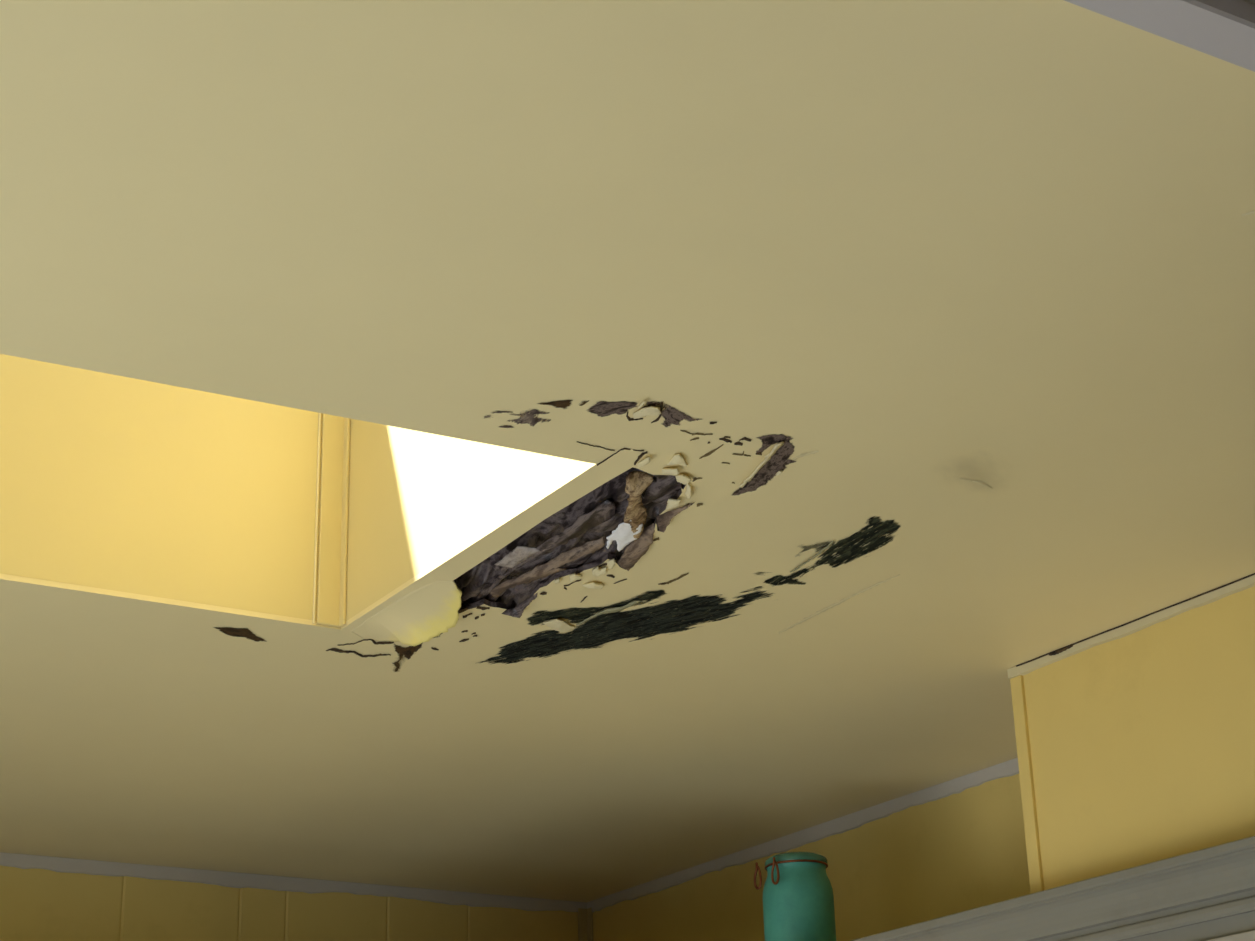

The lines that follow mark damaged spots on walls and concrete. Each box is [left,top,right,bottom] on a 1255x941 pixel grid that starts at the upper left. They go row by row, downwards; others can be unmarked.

spalling [539,400,701,427]
spalling [732,434,796,495]
crack [540,563,627,602]
damp [479,516,900,664]
spalling [215,627,267,642]
peeling [351,580,462,672]
crack [326,606,490,659]